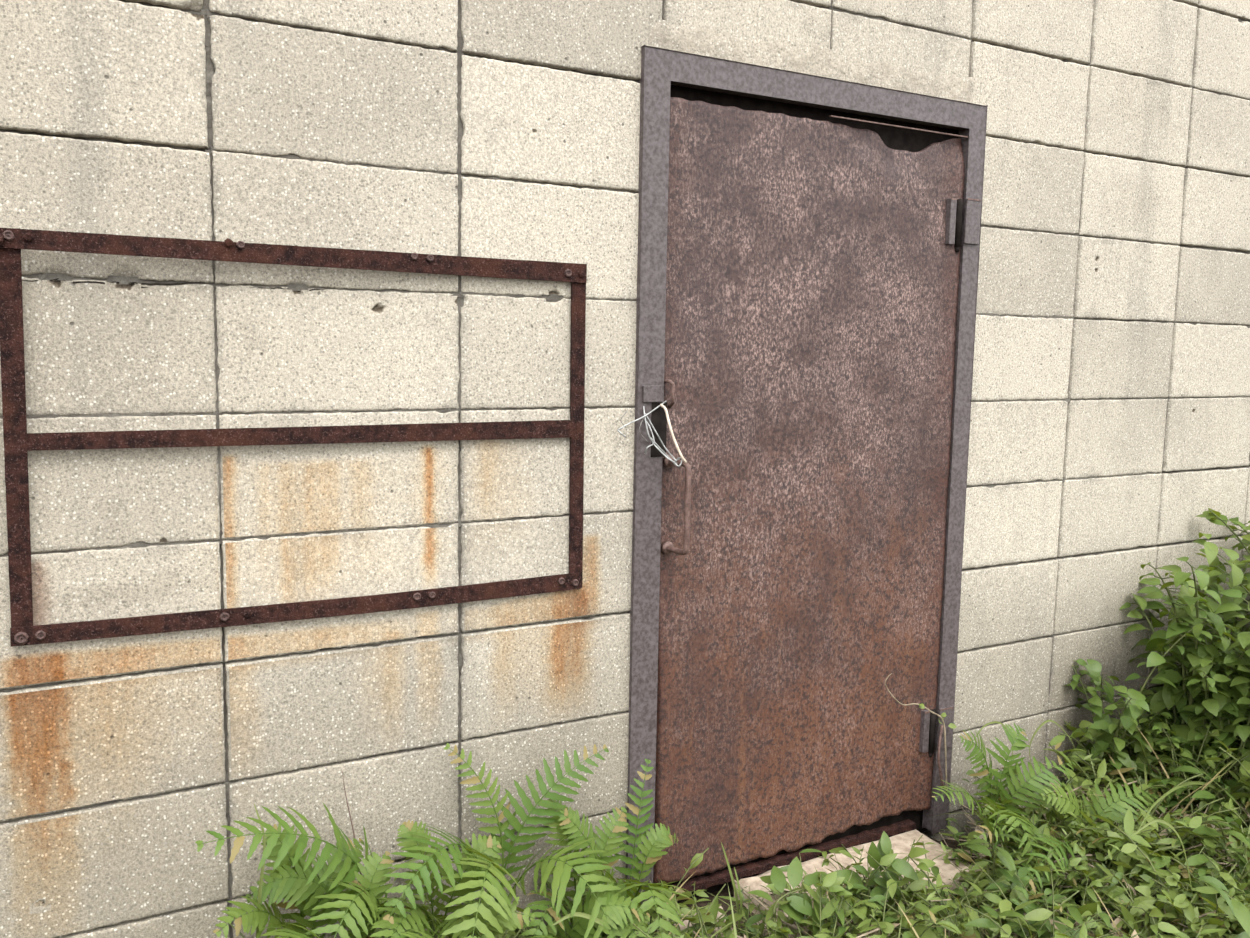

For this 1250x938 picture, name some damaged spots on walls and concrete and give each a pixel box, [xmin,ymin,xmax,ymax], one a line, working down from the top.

crack [22,278,205,288]
crack [250,286,331,294]
corrosion [168,438,547,612]
corrosion [0,531,618,938]